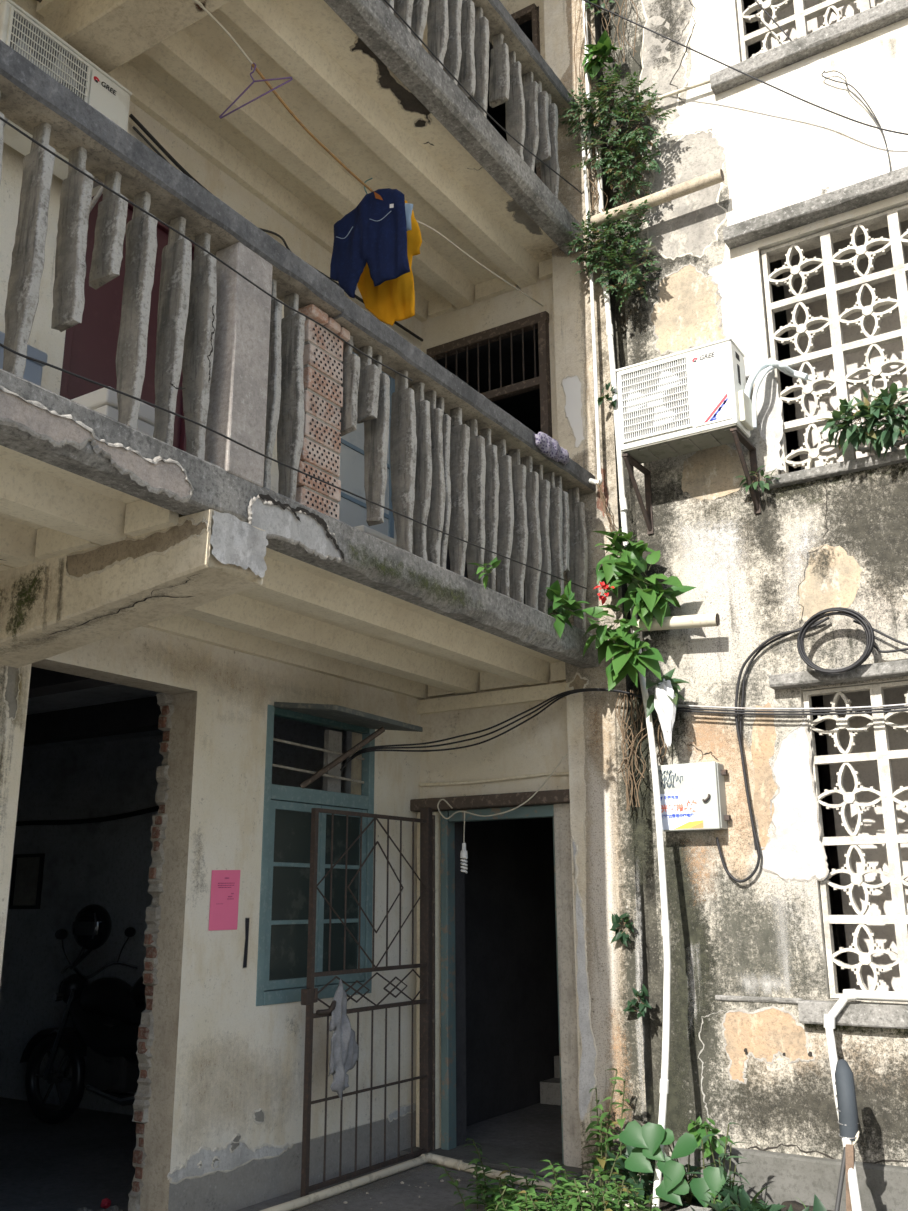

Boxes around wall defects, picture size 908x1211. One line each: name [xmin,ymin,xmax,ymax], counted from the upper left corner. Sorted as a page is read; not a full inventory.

peeling [349,36,432,128]
peeling [639,0,728,356]
peeling [0,385,342,581]
leakage [16,562,63,648]
crack [47,573,202,636]
leakage [683,479,839,617]
peeling [797,544,862,622]
peeling [751,702,829,882]
leakage [746,933,789,992]
peeling [721,1005,815,1084]
peeling [167,1133,293,1185]